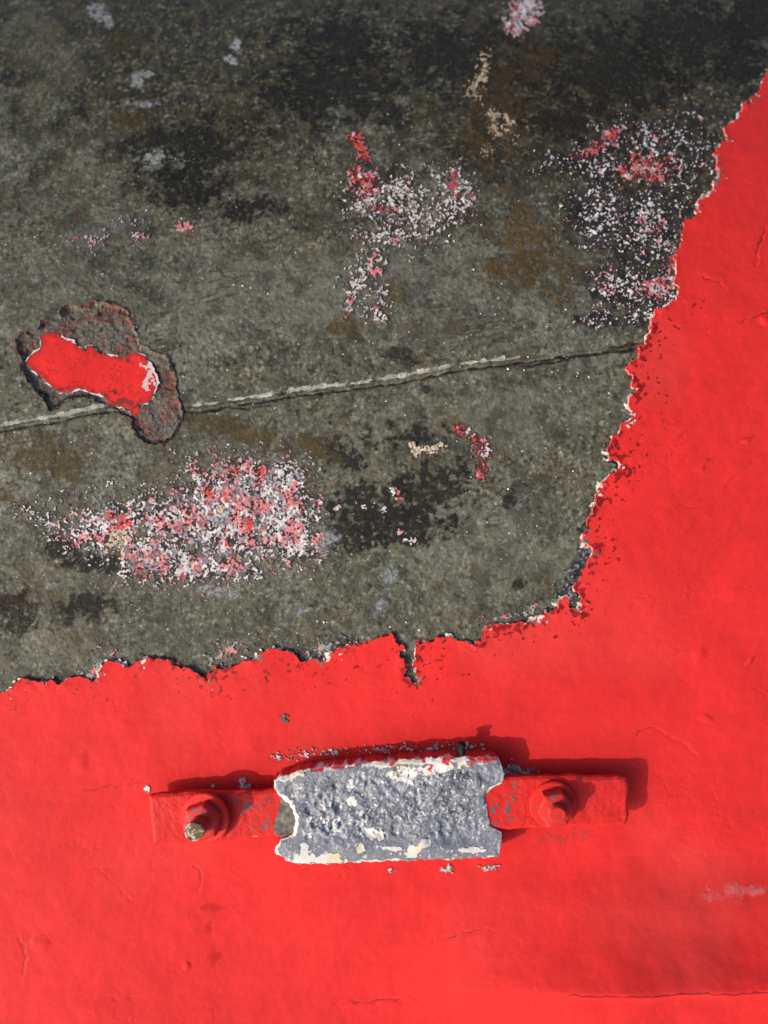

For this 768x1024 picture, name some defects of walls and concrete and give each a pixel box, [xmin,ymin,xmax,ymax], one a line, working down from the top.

crack [0,404,116,433]
peeling [0,0,768,718]
crack [184,342,640,413]
peeling [270,739,540,874]